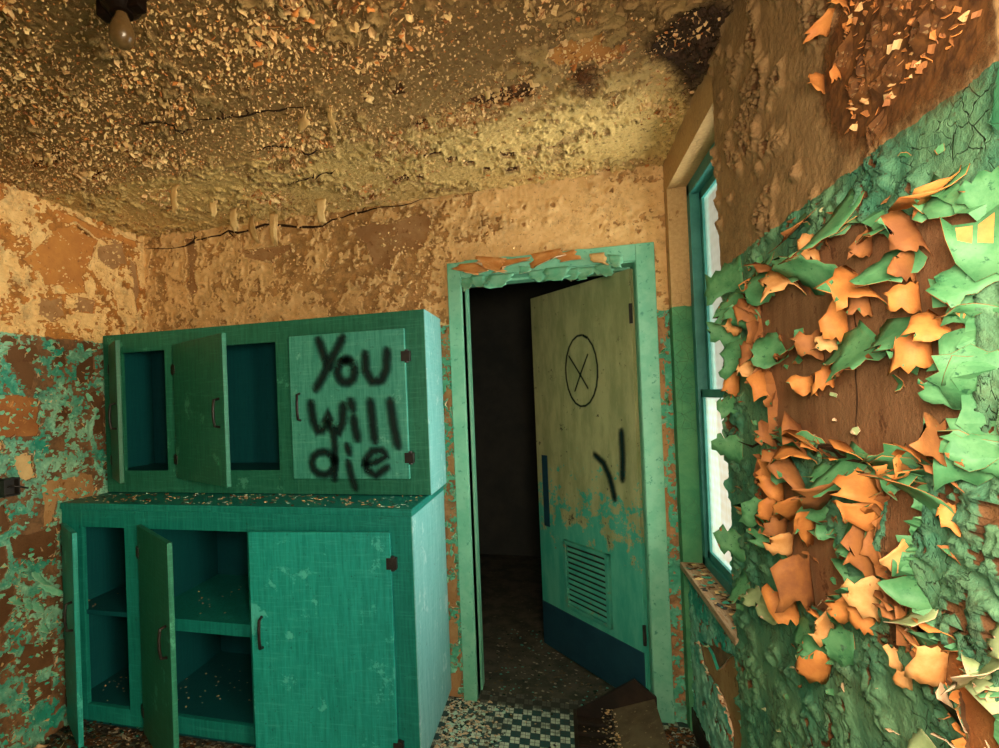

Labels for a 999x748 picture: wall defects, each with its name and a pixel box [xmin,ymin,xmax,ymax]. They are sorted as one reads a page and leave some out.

peeling [803,0,982,134]
peeling [0,0,722,745]
peeling [696,640,742,748]
peeling [704,163,999,748]